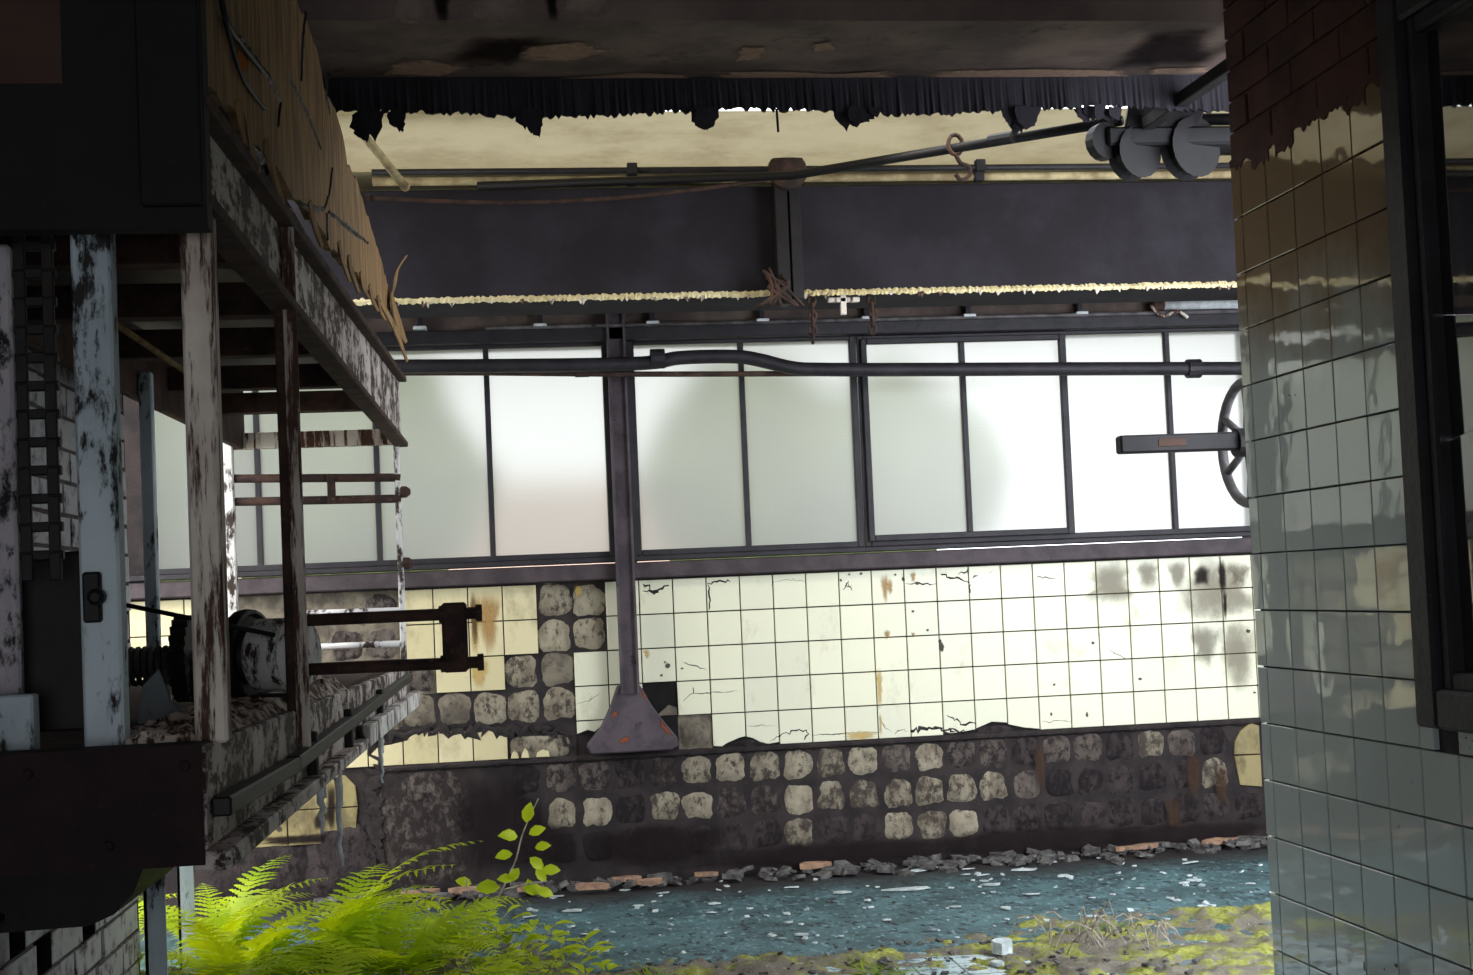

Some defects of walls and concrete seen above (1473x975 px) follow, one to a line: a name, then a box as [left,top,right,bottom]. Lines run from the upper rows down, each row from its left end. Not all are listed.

peeling [322,42,1232,143]
peeling [1229,69,1380,170]
crack [643,584,669,595]
crack [707,579,730,609]
crack [906,569,993,593]
water stain [1195,564,1227,616]
corrosion [471,601,497,644]
corrosion [473,666,485,682]
crack [758,715,976,741]